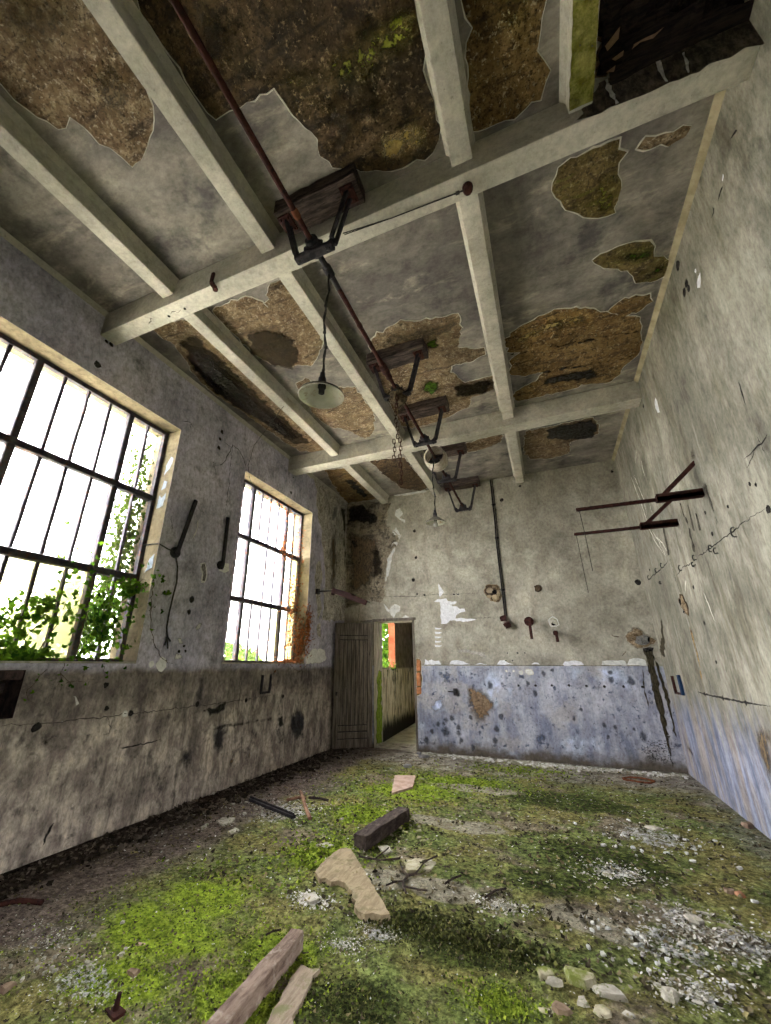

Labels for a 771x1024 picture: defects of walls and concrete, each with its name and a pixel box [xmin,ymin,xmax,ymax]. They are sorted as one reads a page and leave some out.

peeling [0,0,155,168]
peeling [137,0,441,172]
peeling [460,0,551,132]
peeling [551,124,692,219]
peeling [154,319,324,452]
peeling [212,279,324,393]
peeling [309,386,375,439]
peeling [368,313,495,429]
peeling [523,417,600,460]
peeling [505,239,669,401]
leakage [628,655,677,763]